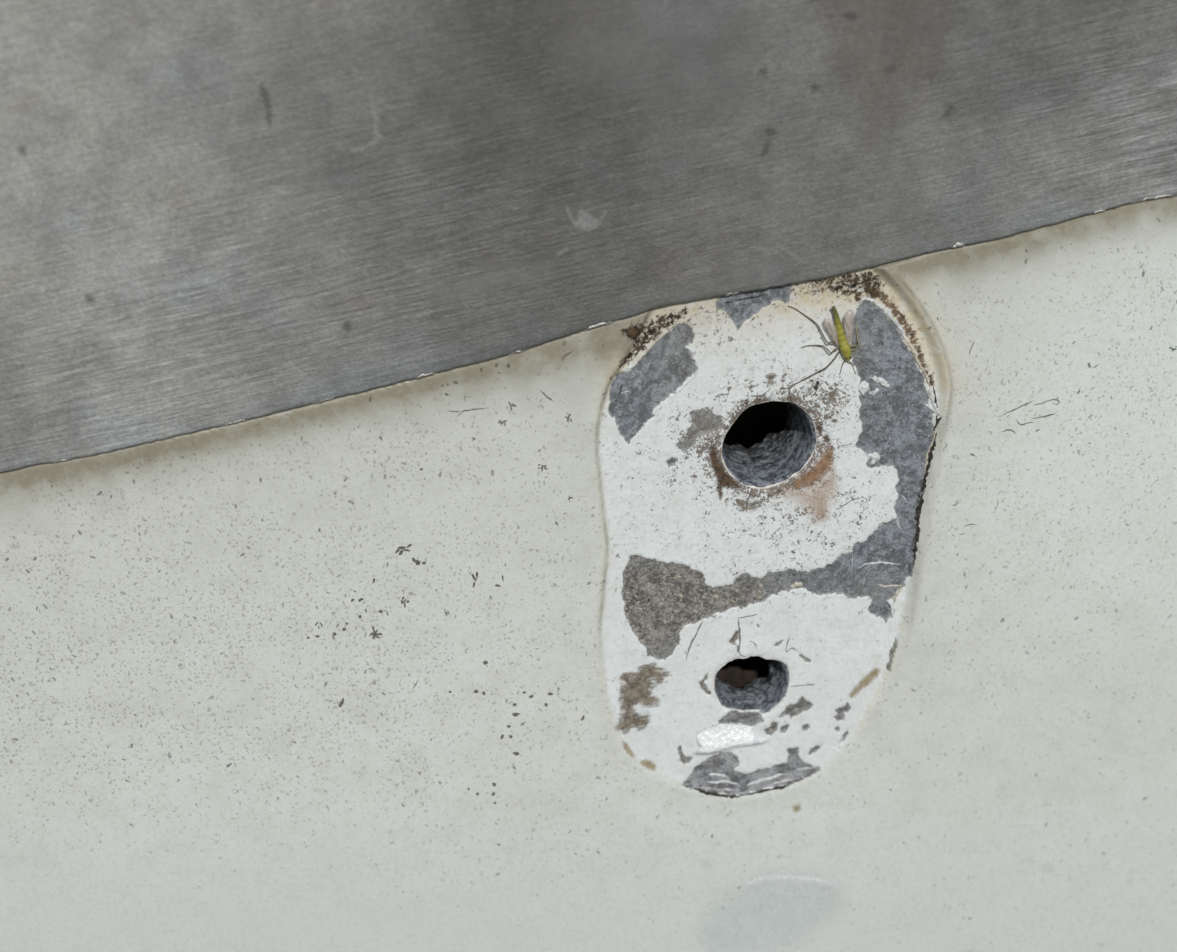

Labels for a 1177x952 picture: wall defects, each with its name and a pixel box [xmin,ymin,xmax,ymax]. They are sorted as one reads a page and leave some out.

peeling [716,284,792,330]
peeling [609,297,941,661]
rust [793,424,833,489]
peeling [886,638,898,672]
peeling [718,696,814,736]
peeling [834,703,851,741]
peeling [677,745,820,799]